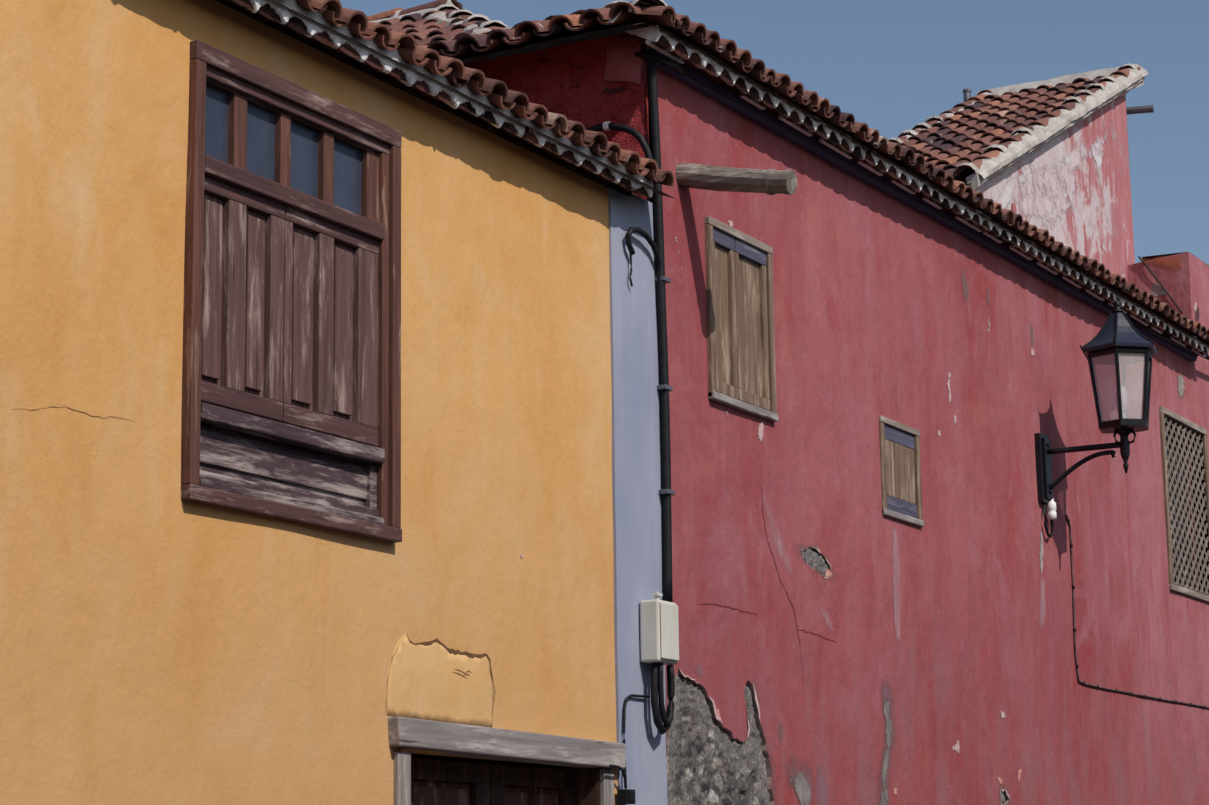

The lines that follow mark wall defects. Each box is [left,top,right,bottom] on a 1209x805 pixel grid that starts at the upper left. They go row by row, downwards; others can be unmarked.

peeling [992,121,1116,230]
flaking render [801,546,832,579]
flaking render [666,668,773,805]
flaking render [790,764,812,805]